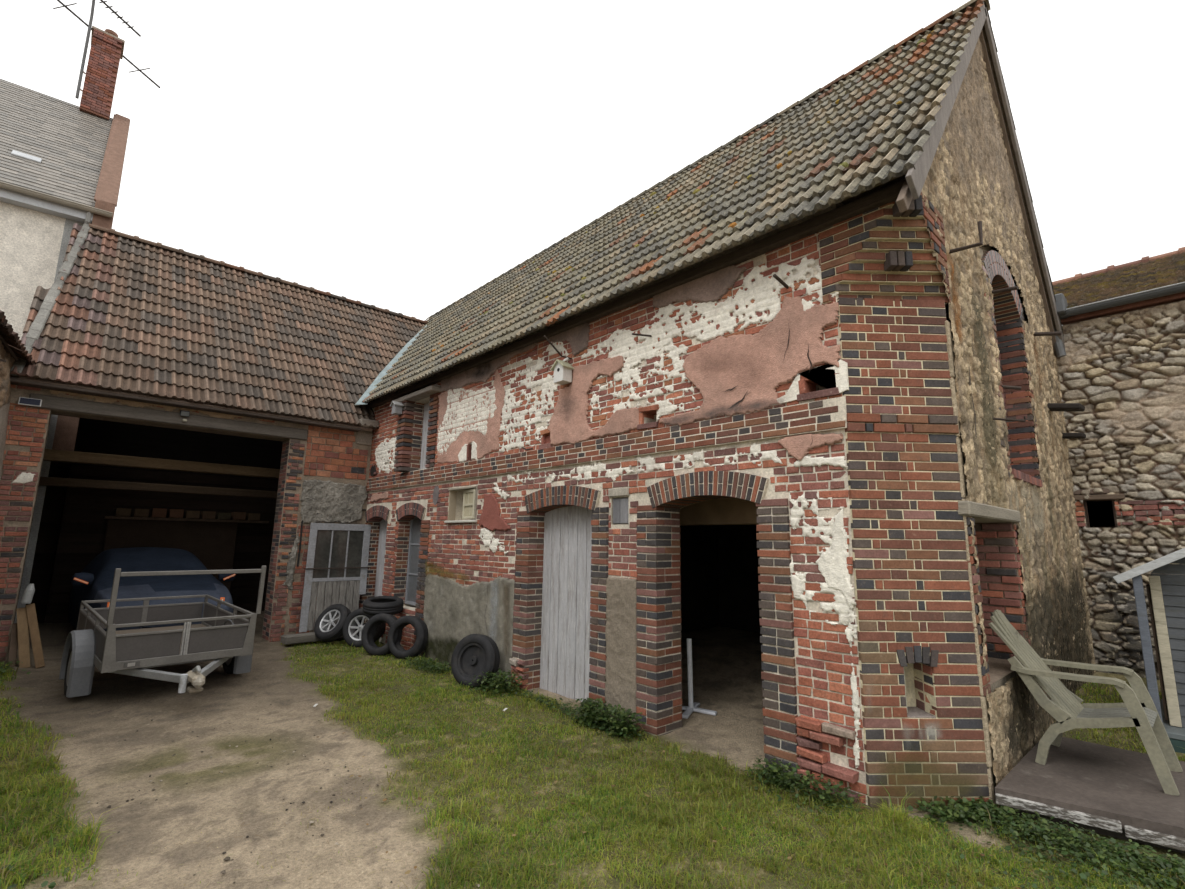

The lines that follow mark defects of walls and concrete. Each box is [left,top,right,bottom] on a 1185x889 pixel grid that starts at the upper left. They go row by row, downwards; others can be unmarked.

peeling [653,265,747,308]
peeling [437,294,849,463]
peeling [624,433,843,474]
peeling [789,554,818,582]